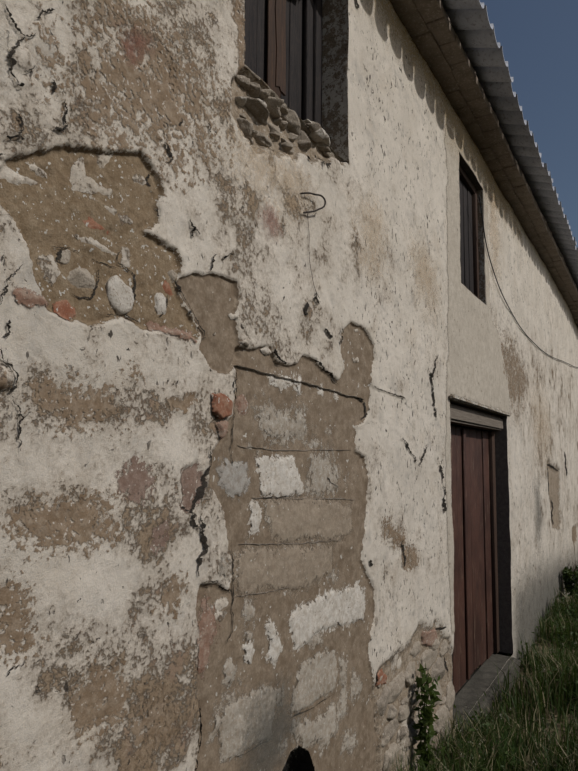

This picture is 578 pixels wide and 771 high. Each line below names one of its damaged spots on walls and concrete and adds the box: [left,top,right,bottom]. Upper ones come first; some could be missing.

crack [6,6,55,87]
crack [52,79,68,132]
spalling [0,0,344,343]
crack [0,264,23,362]
flaking render [21,355,146,444]
crack [430,356,438,417]
crack [182,449,212,576]
crack [403,439,447,513]
flaking render [547,456,561,536]
flaking render [0,455,157,670]
peeling [222,617,283,687]
spalling [370,618,466,771]